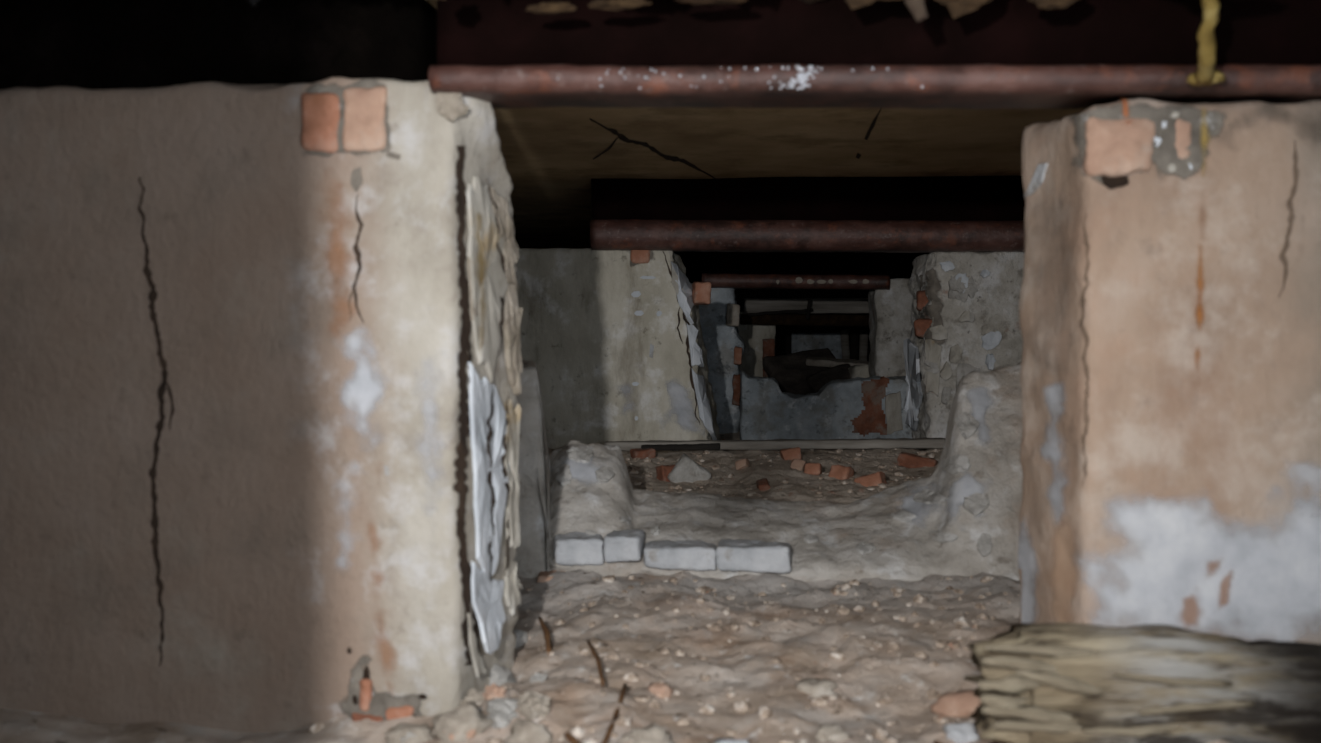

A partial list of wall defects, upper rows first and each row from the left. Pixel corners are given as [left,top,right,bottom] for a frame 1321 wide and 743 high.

flaking render [301,79,401,192]
flaking render [1071,102,1226,189]
crack [348,194,364,324]
crack [1278,140,1298,298]
crack [138,177,175,666]
flaking render [466,176,523,677]
leakage [552,448,615,486]
leakage [891,388,991,543]
leakage [1018,522,1036,623]
leakage [1041,384,1321,642]
flaking render [340,648,427,722]